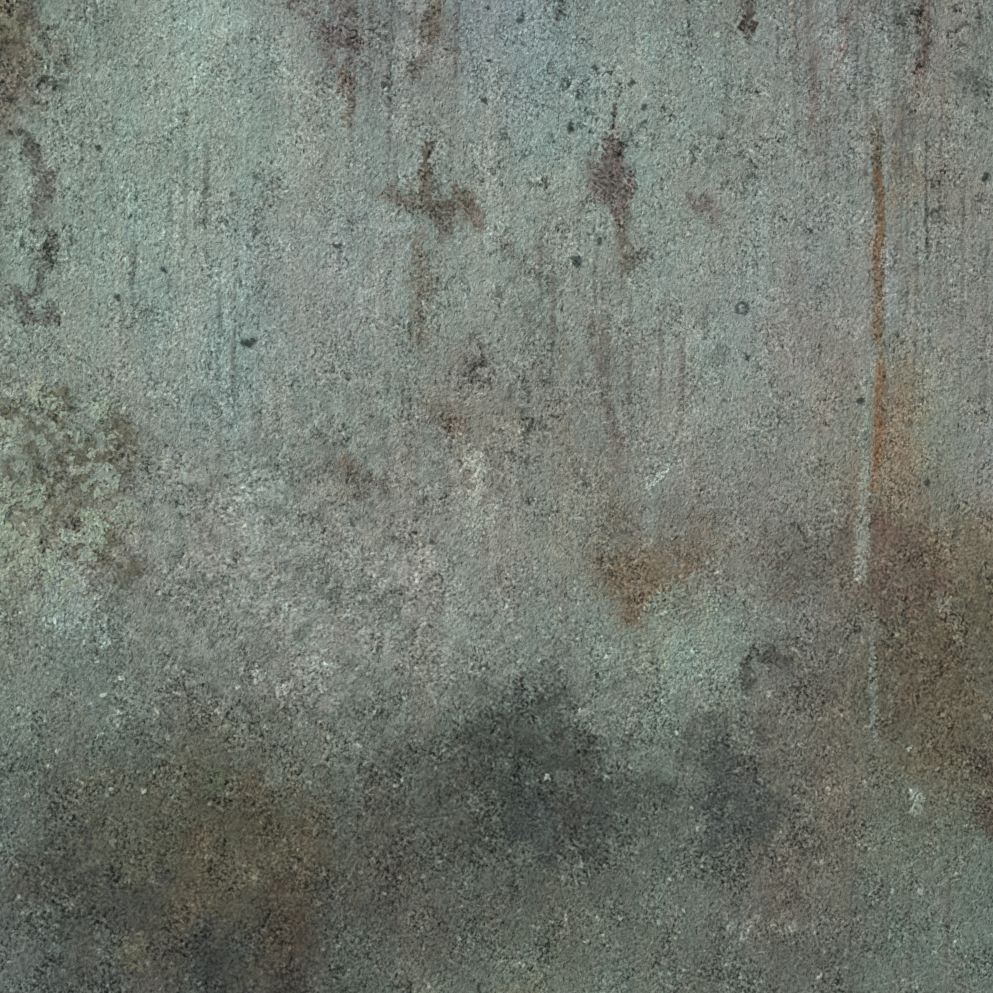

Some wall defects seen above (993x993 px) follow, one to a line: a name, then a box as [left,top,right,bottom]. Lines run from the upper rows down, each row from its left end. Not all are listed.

rust [0,72,19,115]
rust [288,0,370,127]
rust [405,55,425,81]
rust [420,1,441,44]
rust [738,0,758,40]
rust [385,140,487,350]
rust [592,82,653,304]
rust [870,110,919,498]
leakage [739,644,794,694]
leakage [447,677,674,870]
leakage [693,723,787,850]
leakage [181,920,257,993]